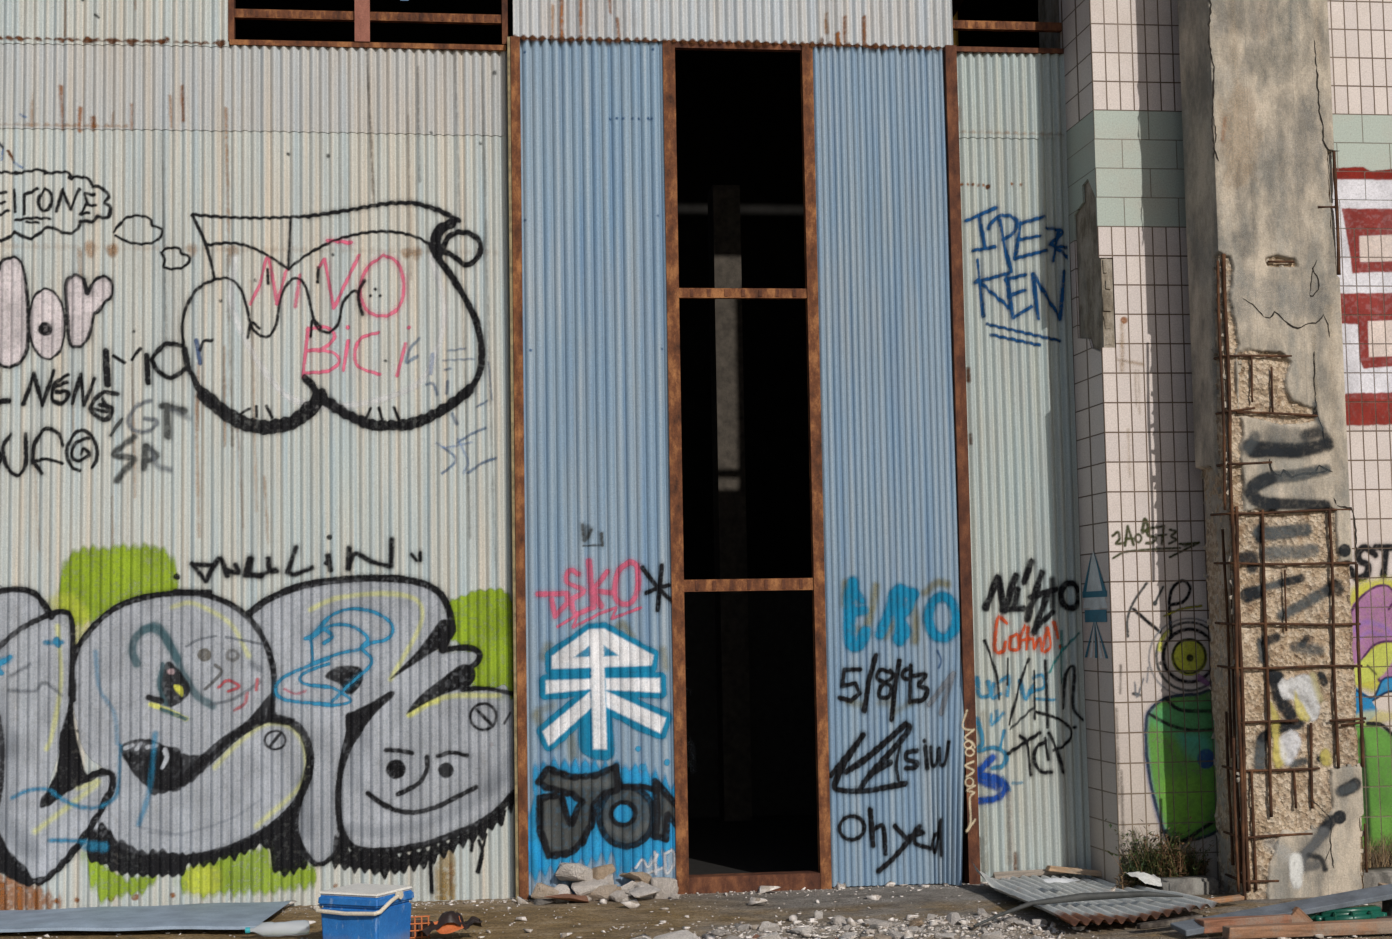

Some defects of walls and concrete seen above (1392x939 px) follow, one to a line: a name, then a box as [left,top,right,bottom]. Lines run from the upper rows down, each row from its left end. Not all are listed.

corrosion [0,32,225,47]
crack [1244,260,1330,423]
spalling [1201,254,1366,900]
spalling [1359,818,1368,889]
corrosion [0,876,79,910]